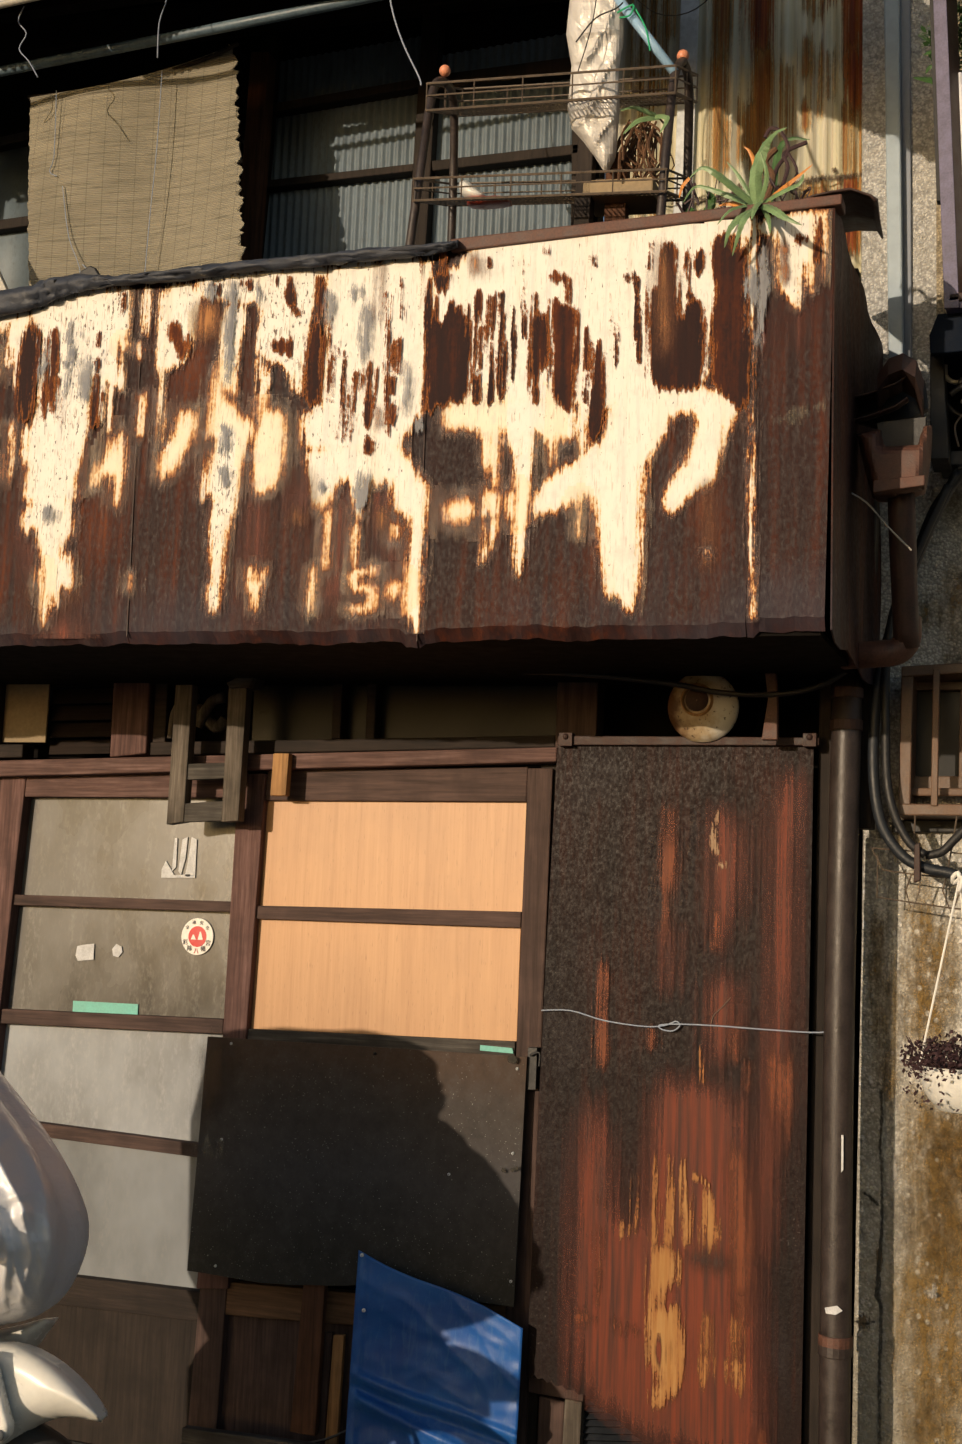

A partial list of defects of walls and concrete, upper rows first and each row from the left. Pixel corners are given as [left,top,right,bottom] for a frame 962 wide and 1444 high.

corrosion [630,0,677,132]
corrosion [672,0,863,205]
corrosion [845,231,861,256]
corrosion [14,320,104,429]
peeling [0,209,832,634]
corrosion [167,215,826,611]
corrosion [16,503,59,598]
corrosion [41,588,90,639]
corrosion [526,733,820,1444]
water stain [868,898,962,1444]